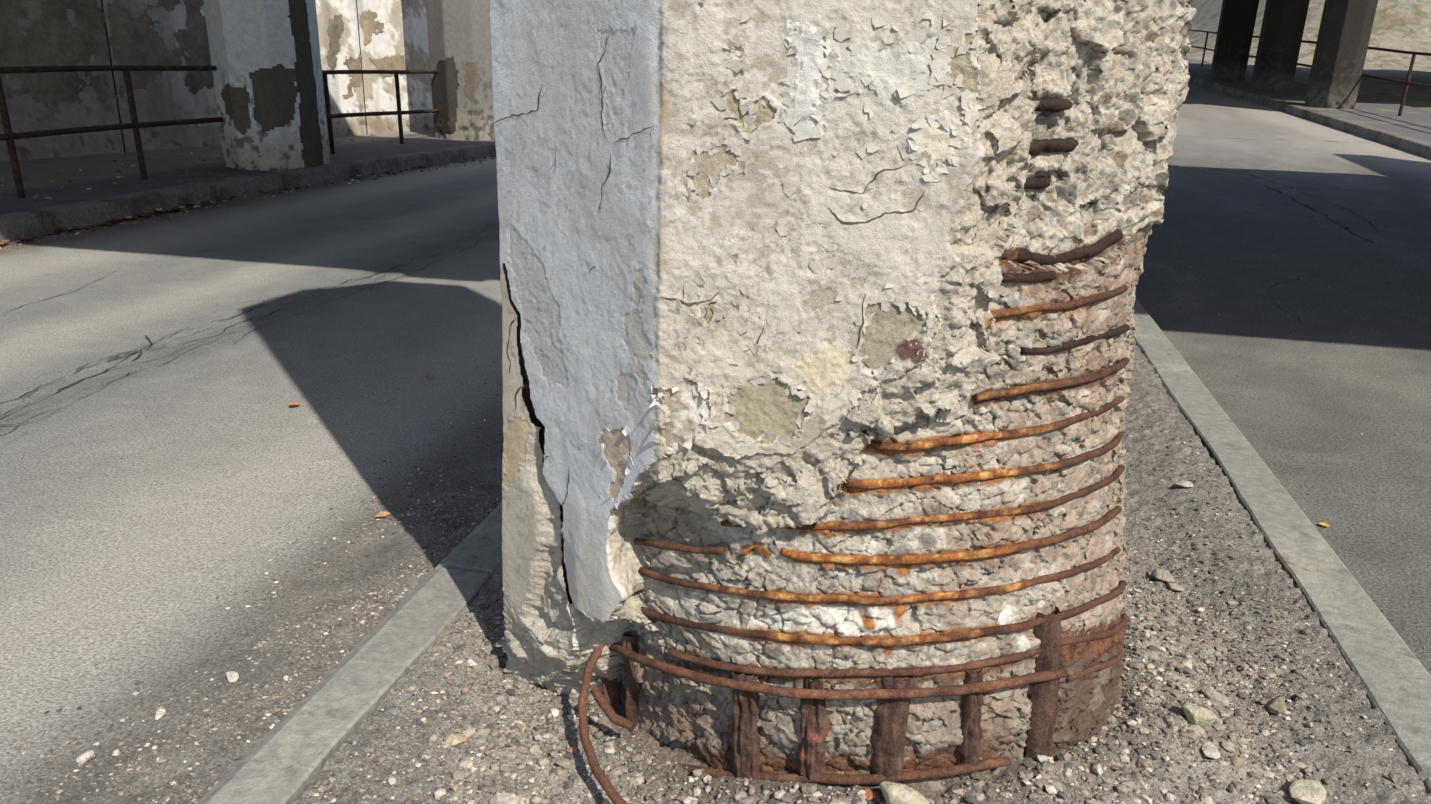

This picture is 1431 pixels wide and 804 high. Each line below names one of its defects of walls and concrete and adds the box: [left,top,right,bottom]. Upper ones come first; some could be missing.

peeling [0,0,408,167]
crack [494,85,547,123]
crack [597,31,653,216]
crack [828,144,925,224]
crack [506,317,529,410]
spalling [502,0,1196,792]
rust [896,339,926,364]
rust [973,360,1117,408]
rust [841,468,1016,497]
rust [865,429,1010,456]
rust [740,500,1050,576]
rust [681,588,1039,689]